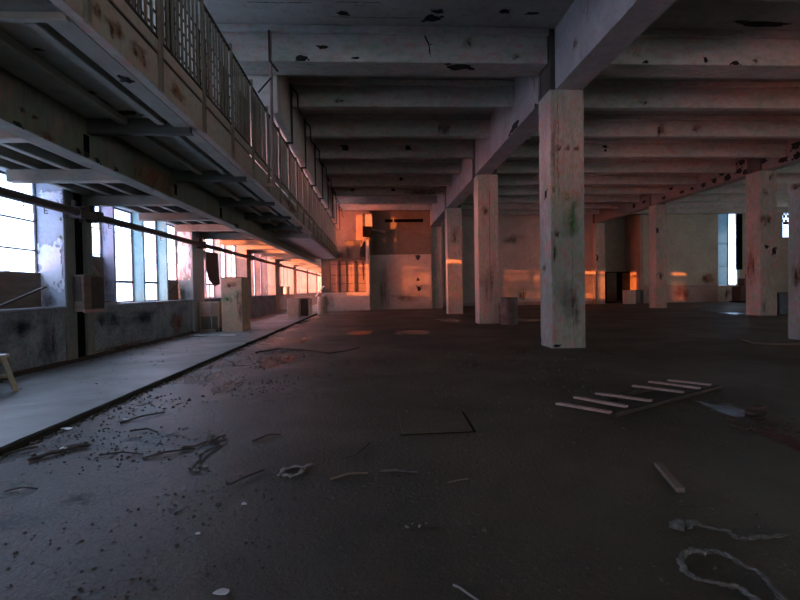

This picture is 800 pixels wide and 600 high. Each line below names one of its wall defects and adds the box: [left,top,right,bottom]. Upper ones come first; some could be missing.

spalling [444,63,475,71]
spalling [662,158,747,200]
peeling [37,238,65,293]